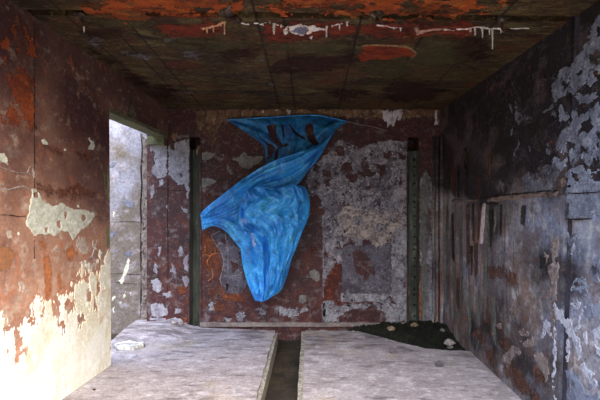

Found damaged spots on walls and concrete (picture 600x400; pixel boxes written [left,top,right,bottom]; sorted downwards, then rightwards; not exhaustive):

rust [79,0,244,38]
rust [258,0,513,63]
rust [0,67,37,130]
peeling [452,15,600,244]
peeling [122,109,441,324]
peeling [0,189,132,400]
rust [323,262,342,305]
water stain [419,171,534,348]
peeling [544,232,582,341]
peeling [571,254,600,294]
rust [486,322,544,400]
peeling [565,367,600,400]